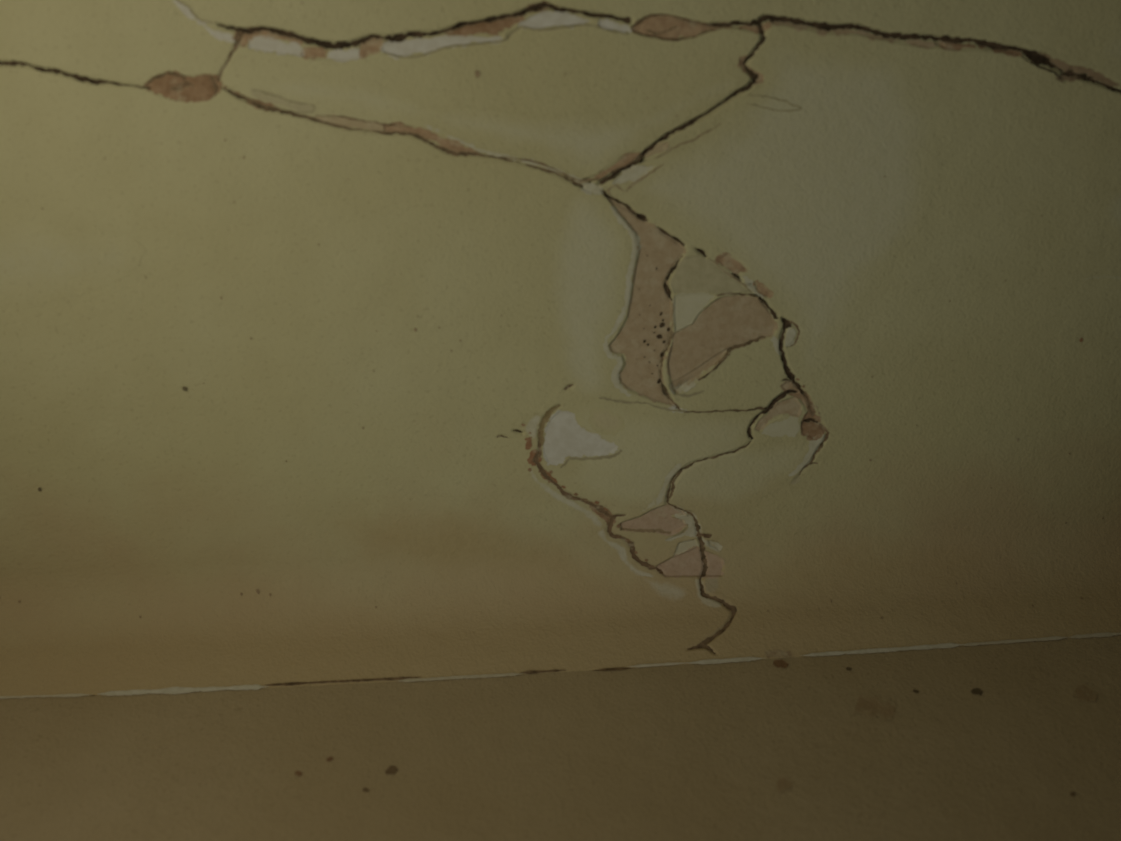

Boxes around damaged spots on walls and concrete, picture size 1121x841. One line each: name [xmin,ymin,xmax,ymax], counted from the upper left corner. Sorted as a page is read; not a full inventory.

crack [0,0,1121,196]
flaking render [602,190,778,408]
crack [0,317,830,699]
peeling [543,406,625,468]
crack [801,632,1121,657]